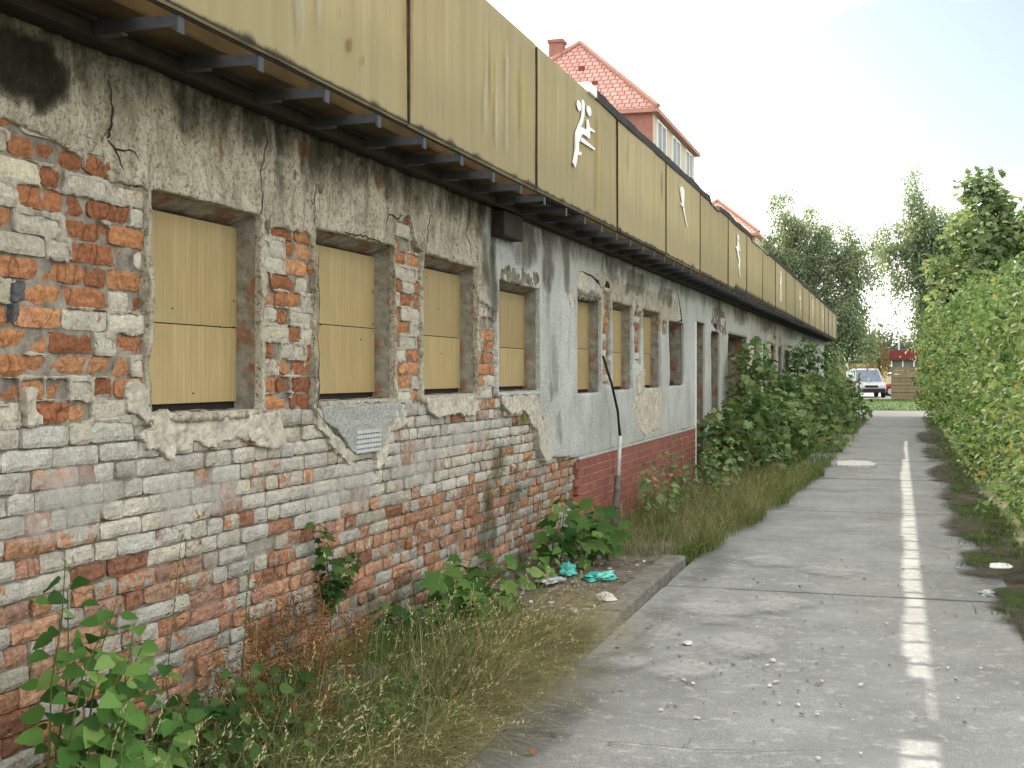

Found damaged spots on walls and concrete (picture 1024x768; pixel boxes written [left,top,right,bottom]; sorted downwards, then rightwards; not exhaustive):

water stain [0,28,69,114]
crack [102,80,140,169]
crack [260,121,270,214]
spalling [499,265,539,289]
peeling [19,387,43,428]
flaking render [122,379,287,460]
flaking render [309,401,408,469]
flaking render [424,395,480,419]
flaking render [498,394,552,462]
spalling [632,369,663,437]